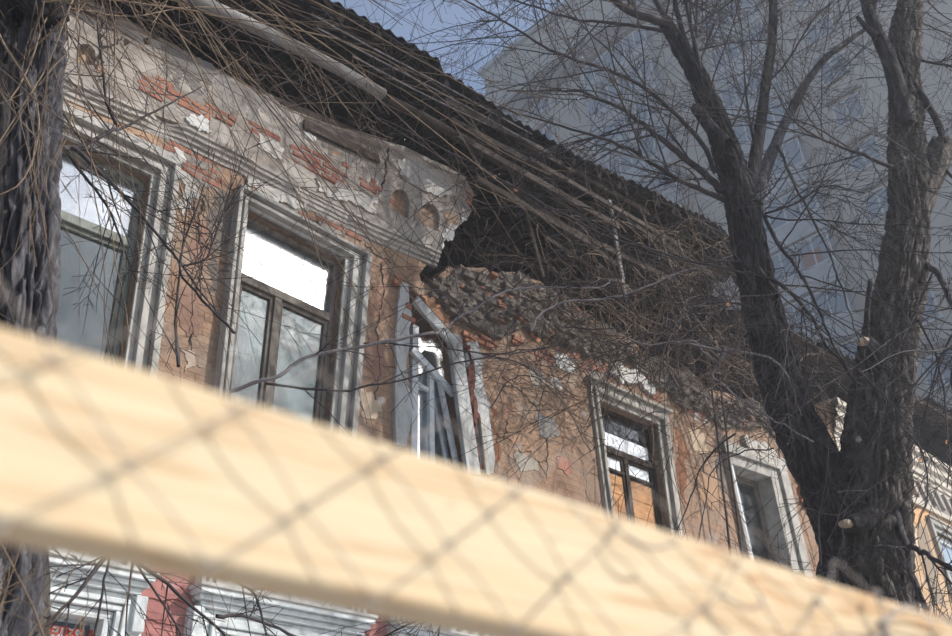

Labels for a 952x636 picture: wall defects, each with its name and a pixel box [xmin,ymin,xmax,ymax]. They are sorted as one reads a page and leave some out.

flaking render [133,68,236,134]
flaking render [64,101,224,266]
flaking render [245,176,370,244]
flaking render [248,120,399,215]
flaking render [441,212,467,250]
spalling [363,334,389,381]
peeling [360,389,382,420]